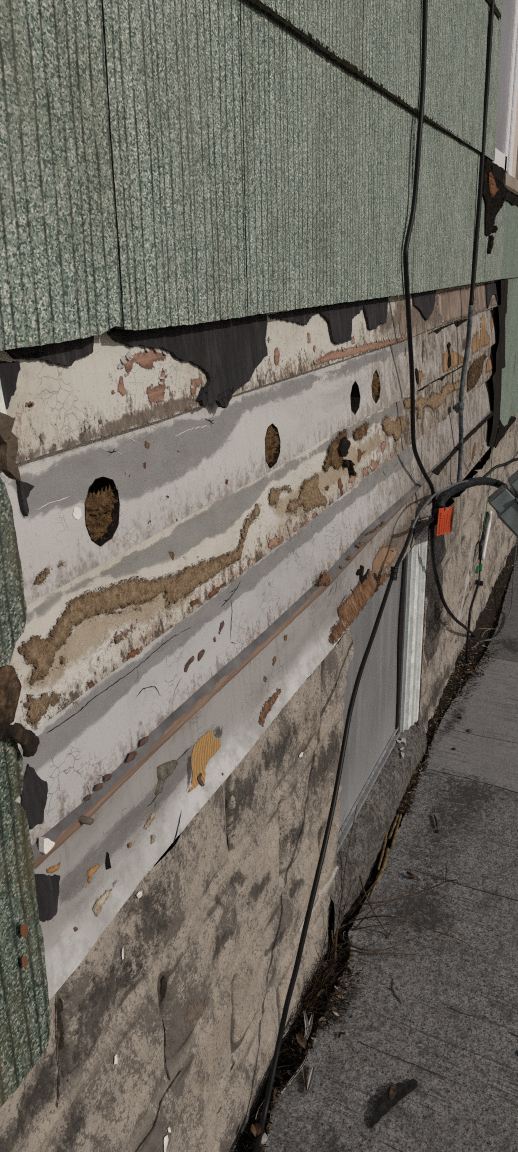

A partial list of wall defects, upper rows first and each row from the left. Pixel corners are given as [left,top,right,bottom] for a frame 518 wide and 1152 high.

peeling [436,283,500,373]
peeling [112,347,169,405]
spalling [432,411,493,475]
damp [25,592,191,685]
peeling [184,620,224,672]
peeling [39,837,61,873]
damp [60,747,194,900]
peeling [189,730,221,792]
damp [231,870,271,901]
damp [223,720,312,845]
damp [283,724,342,847]
damp [69,875,174,1070]